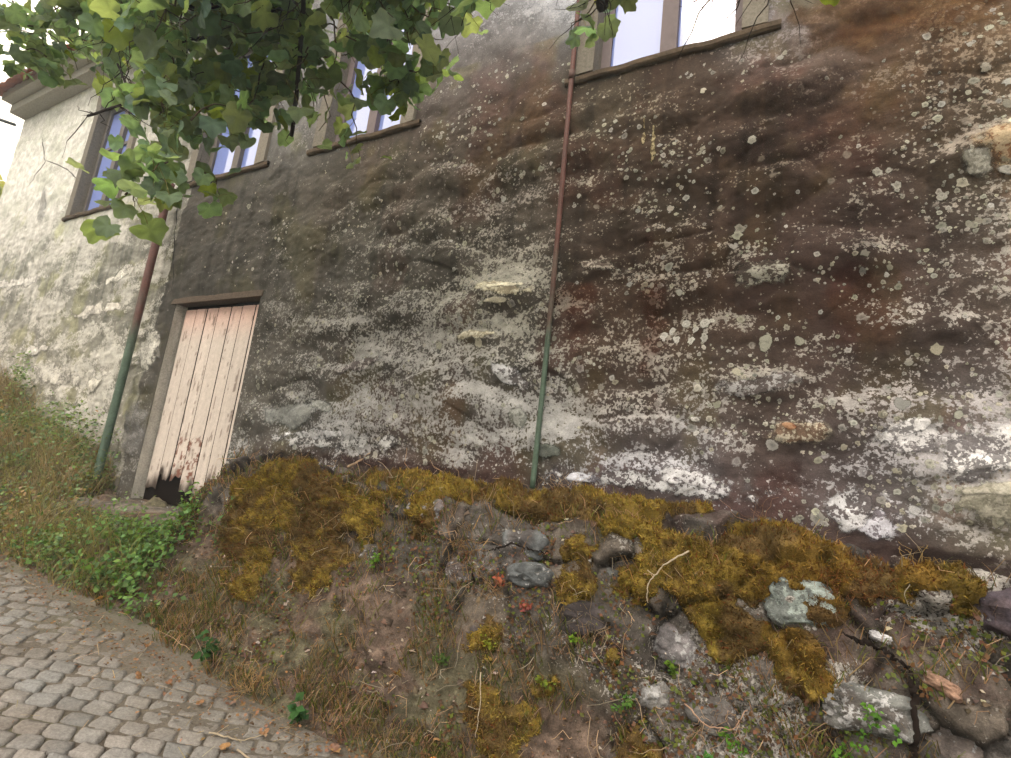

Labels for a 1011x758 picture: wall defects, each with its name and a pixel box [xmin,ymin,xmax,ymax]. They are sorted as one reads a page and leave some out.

flaking render [963,118,1011,175]